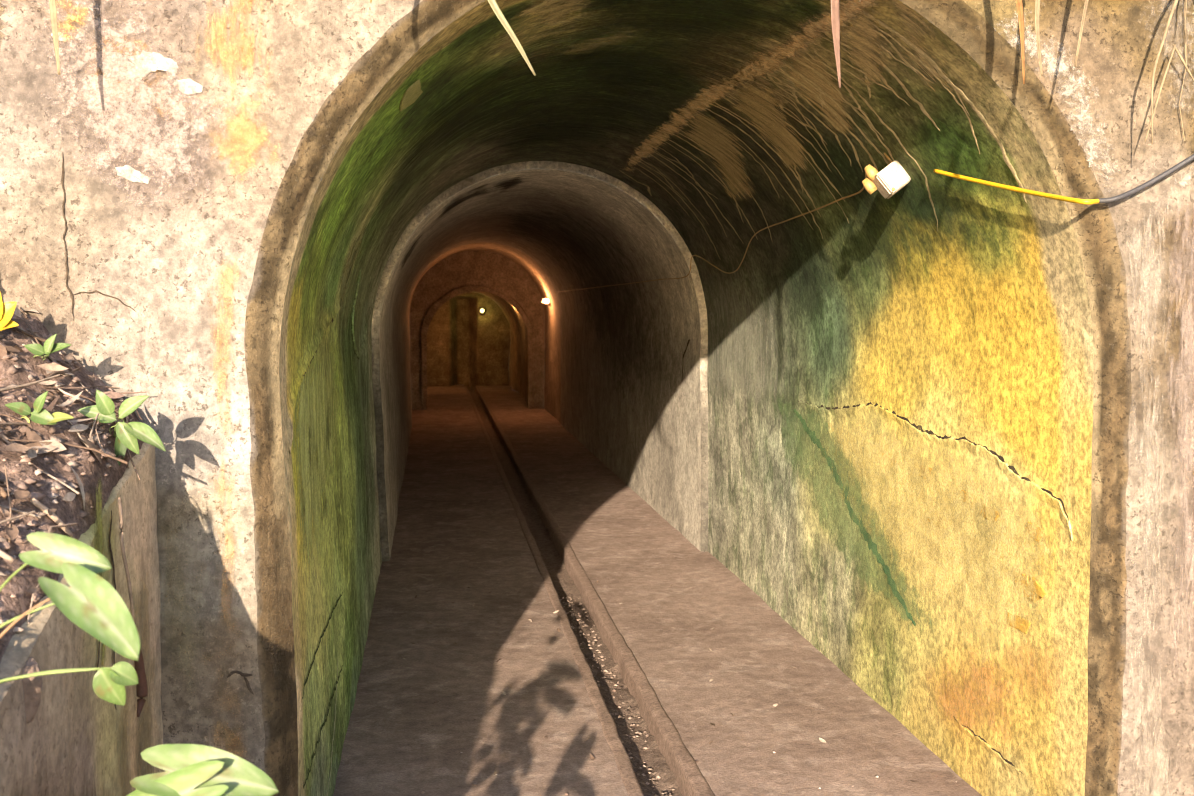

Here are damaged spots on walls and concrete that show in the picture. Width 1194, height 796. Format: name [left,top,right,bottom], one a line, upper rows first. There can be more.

damp [621,5,1027,260]
damp [1005,13,1117,179]
crack [61,153,136,321]
crack [96,641,115,673]
crack [108,510,116,590]
damp [258,515,297,722]
crack [287,259,355,454]
crack [302,592,343,788]
crack [798,401,1073,543]
damp [1171,219,1194,598]